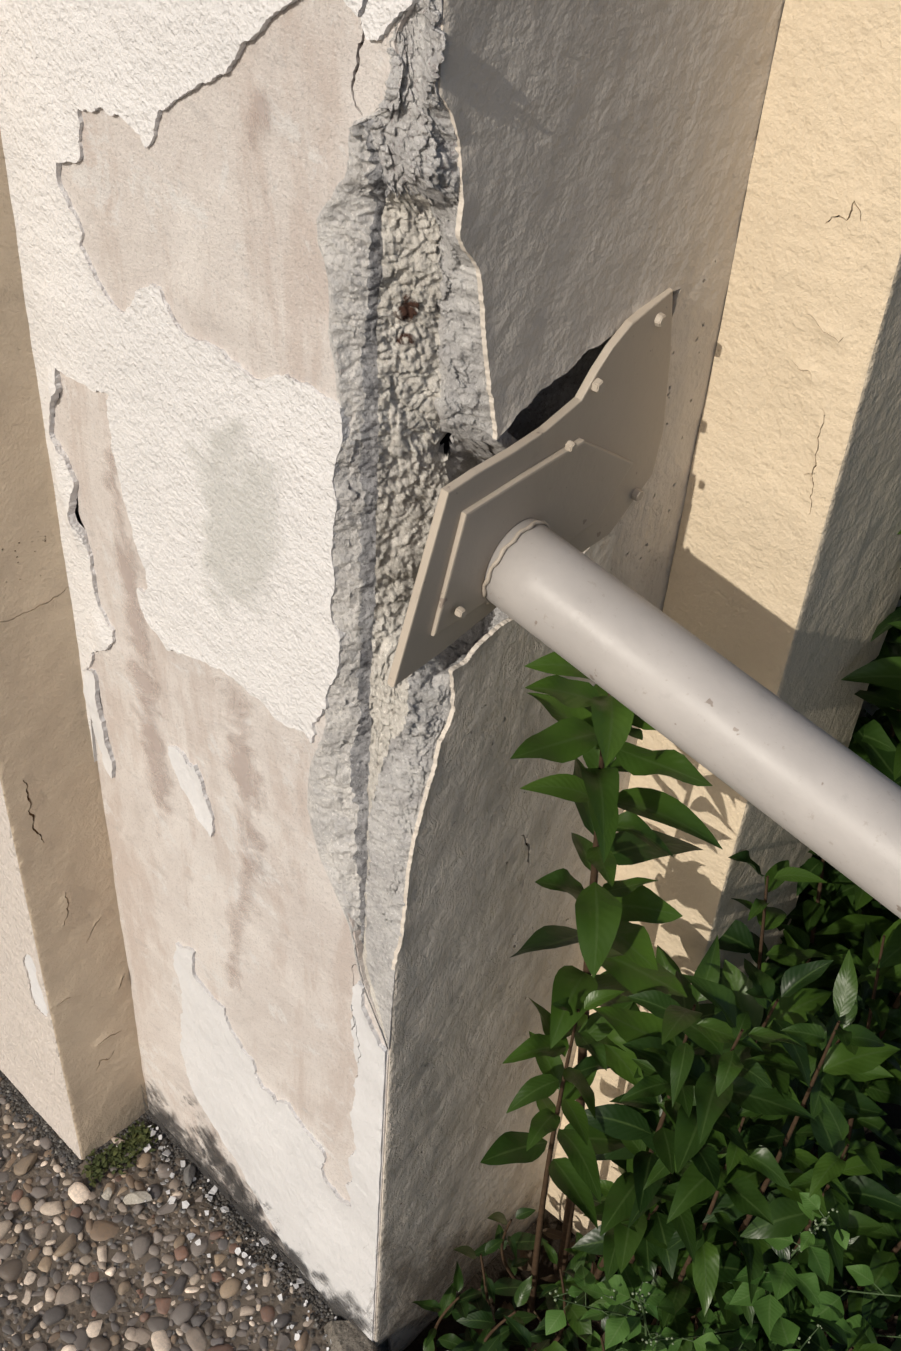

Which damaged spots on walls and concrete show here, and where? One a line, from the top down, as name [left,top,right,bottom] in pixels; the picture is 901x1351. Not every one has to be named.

corrosion [388,294,420,345]
crack [349,118,390,944]
peeling [54,0,612,1344]
crack [23,780,43,841]
peeling [24,954,48,1016]
leakage [141,1084,370,1331]
leakage [383,1215,515,1351]